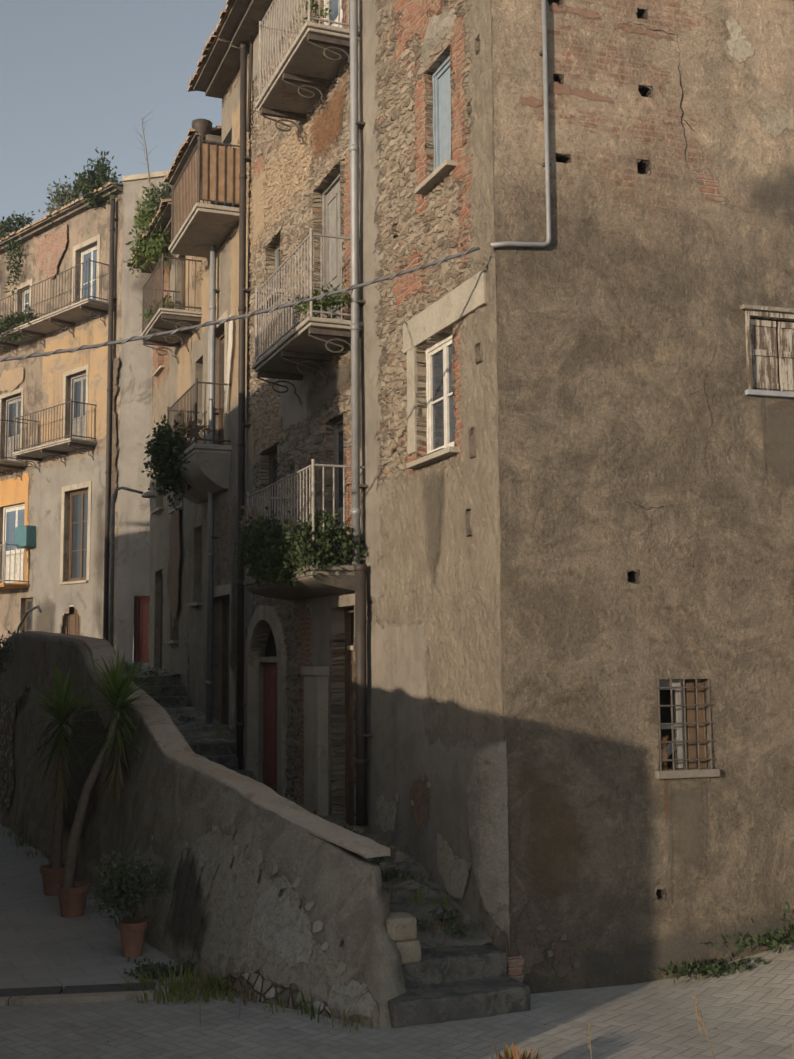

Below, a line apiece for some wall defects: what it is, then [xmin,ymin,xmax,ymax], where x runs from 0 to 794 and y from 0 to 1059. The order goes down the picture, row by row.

spalling [636,8,648,20]
spalling [638,84,653,98]
crack [629,21,694,165]
spalling [555,153,572,164]
spalling [637,159,651,175]